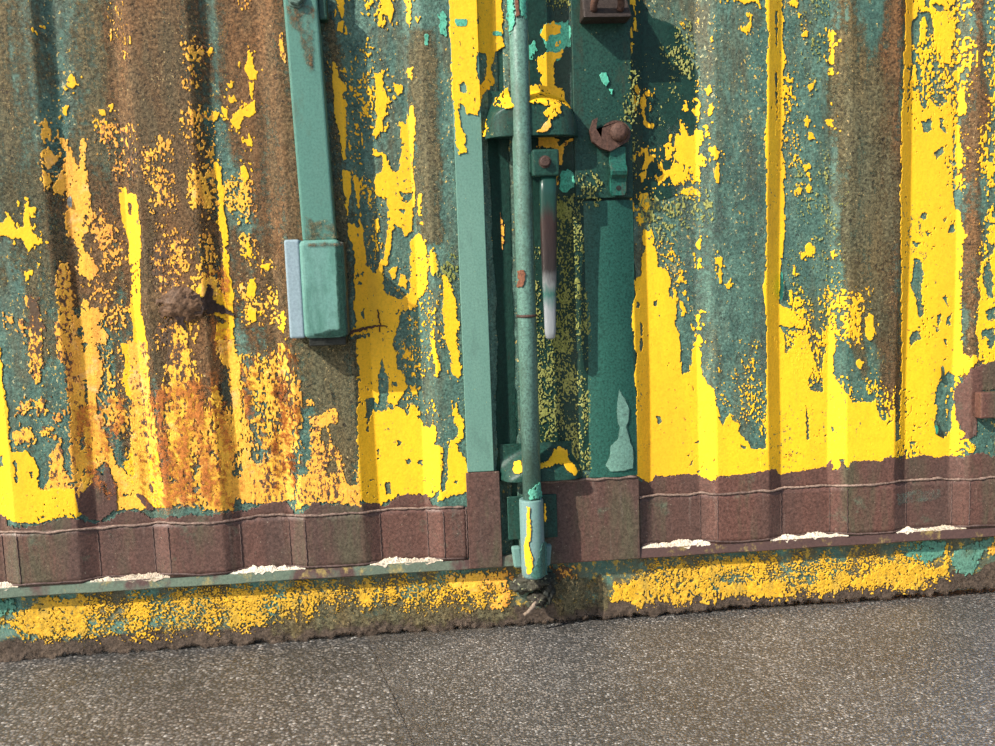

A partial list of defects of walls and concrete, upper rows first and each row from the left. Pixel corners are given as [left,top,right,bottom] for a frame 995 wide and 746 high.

corrosion [0,0,361,522]
peeling [0,34,468,524]
peeling [361,0,421,31]
corrosion [404,28,445,245]
peeling [424,0,527,155]
peeling [529,0,603,478]
peeling [620,0,995,483]
corrosion [827,0,907,421]
corrosion [953,0,995,440]
peeling [0,567,514,645]
peeling [524,482,577,583]
peeling [610,536,995,613]